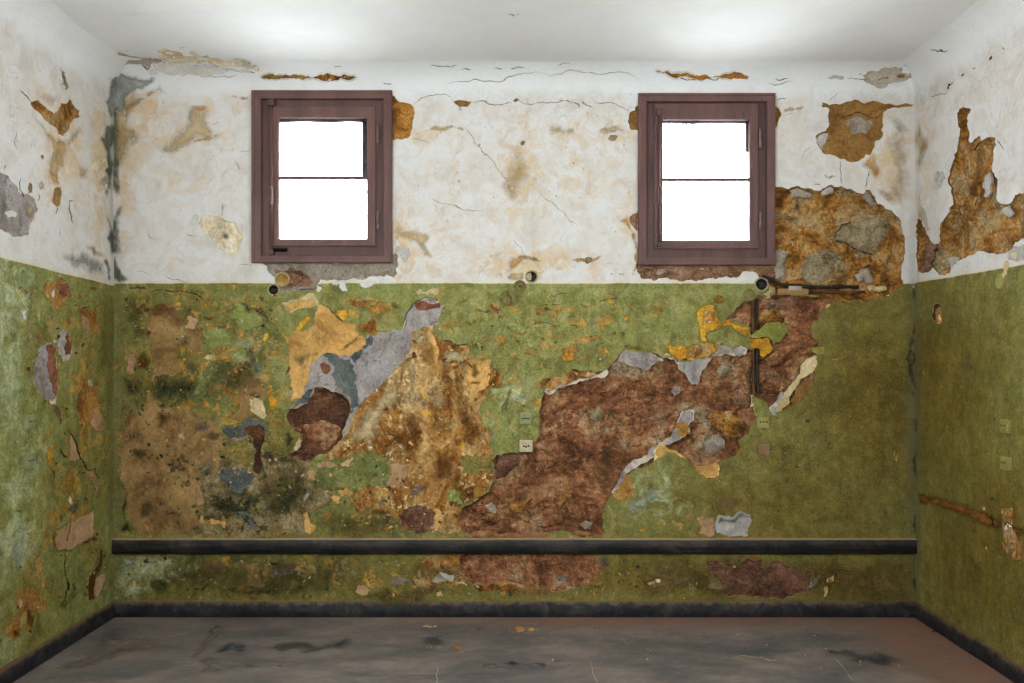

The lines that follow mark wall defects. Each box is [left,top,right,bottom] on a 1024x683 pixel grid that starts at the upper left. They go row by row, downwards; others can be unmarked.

peeling [117,47,358,83]
flaking render [21,69,79,136]
damp [101,74,152,194]
crack [414,63,635,194]
peeling [0,172,62,237]
damp [71,208,126,282]
flaking render [119,96,1024,538]
flaking render [17,275,108,481]
corrosion [919,494,1024,540]
peeling [0,471,109,643]
flaking render [706,555,858,600]